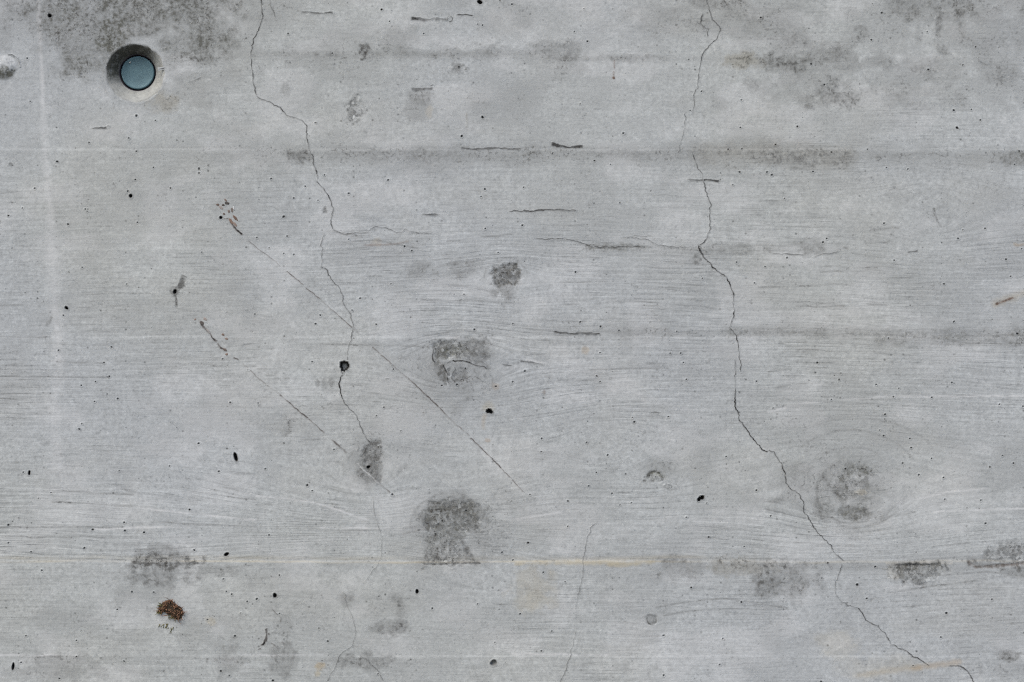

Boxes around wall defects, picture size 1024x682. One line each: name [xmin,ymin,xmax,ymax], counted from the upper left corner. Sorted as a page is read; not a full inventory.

crack [410,13,474,23]
crack [460,144,522,152]
crack [250,0,440,455]
crack [508,0,975,682]
crack [431,347,544,384]
crack [325,496,385,682]
crack [256,609,286,652]